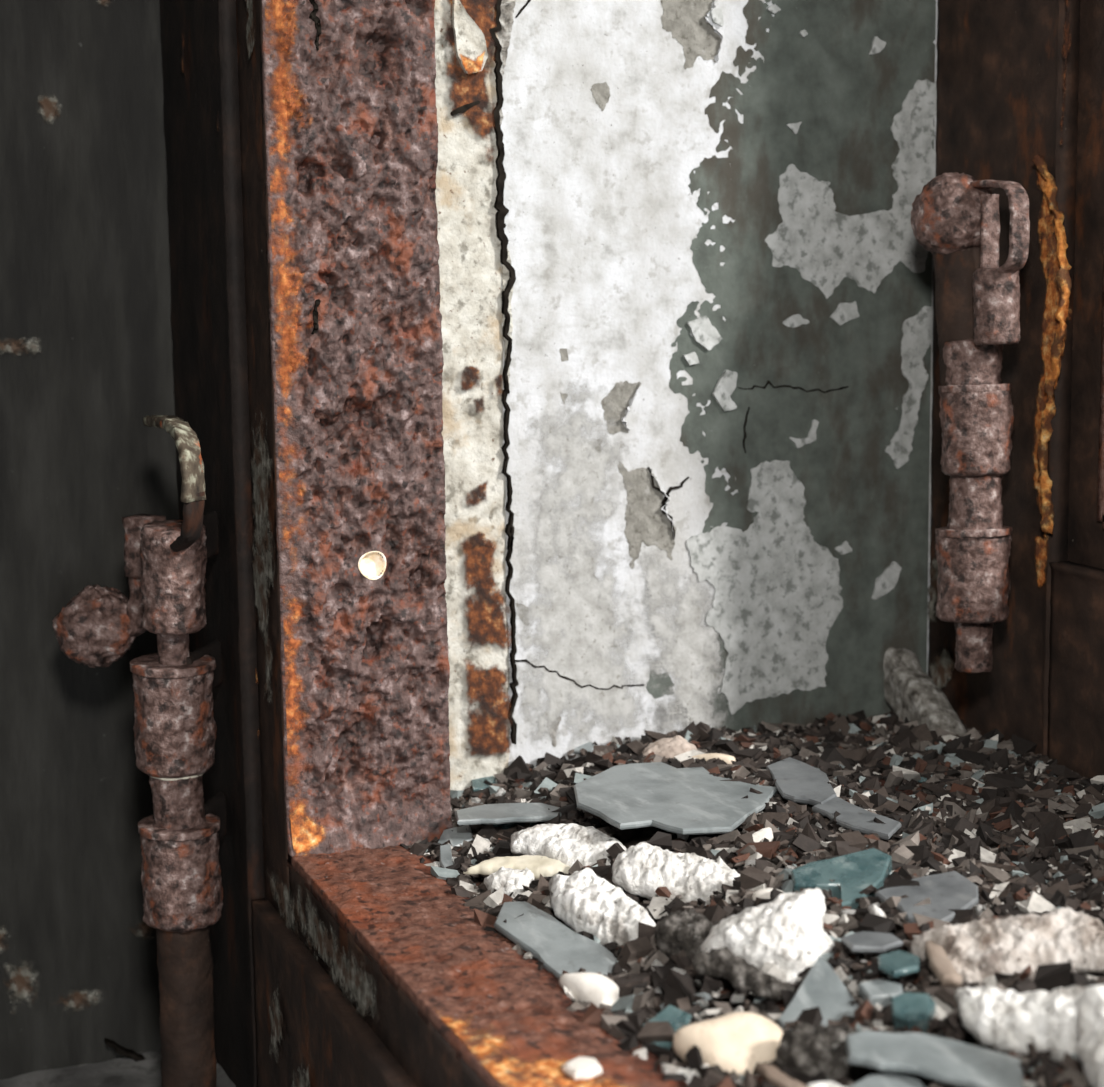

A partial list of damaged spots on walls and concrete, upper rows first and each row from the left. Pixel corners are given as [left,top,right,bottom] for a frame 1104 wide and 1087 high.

rust [445,0,498,161]
peeling [590,82,610,111]
rust [462,366,484,412]
crack [450,0,644,744]
peeling [597,381,641,444]
peeling [618,0,967,736]
rust [1031,154,1072,586]
rust [466,481,488,505]
rust [461,532,510,649]
rust [465,661,510,756]
rust [289,801,324,853]
rust [440,1017,627,1087]